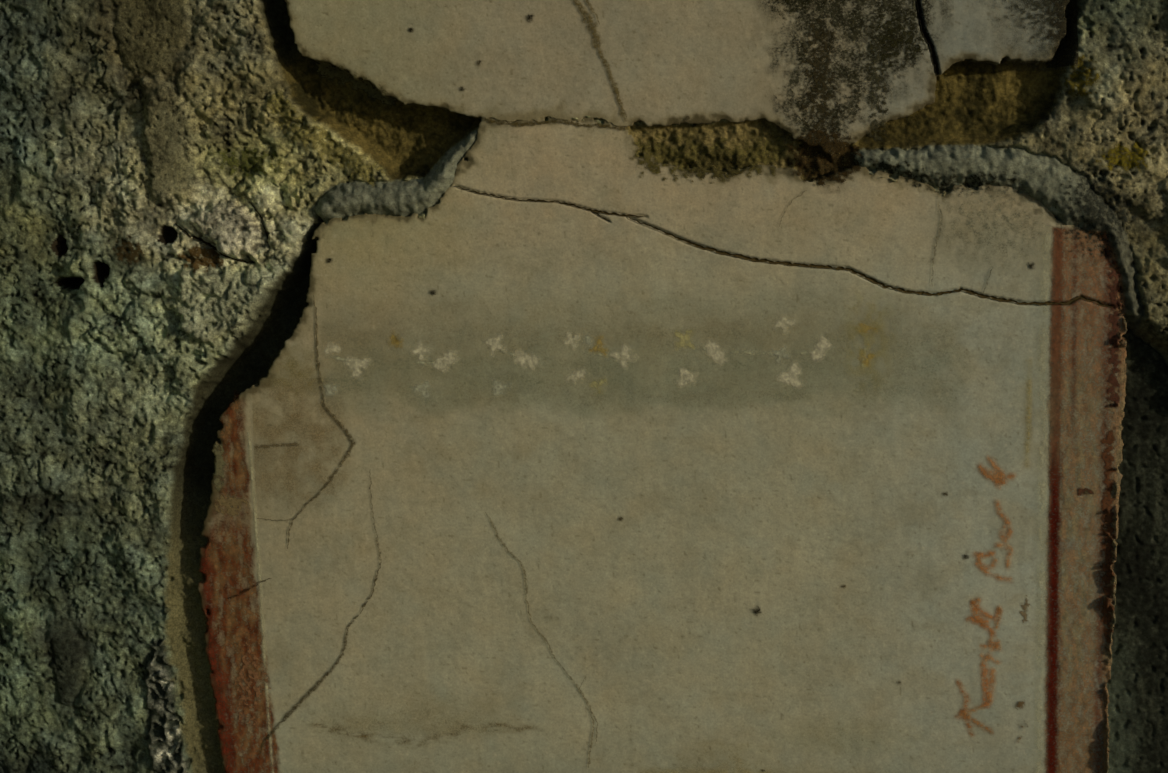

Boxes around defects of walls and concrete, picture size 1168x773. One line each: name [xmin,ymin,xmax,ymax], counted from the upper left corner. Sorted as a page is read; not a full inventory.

spalling [164,214,332,773]
crack [257,295,355,549]
crack [261,484,381,751]
spalling [259,0,481,181]
crack [485,0,629,130]
crack [457,186,1113,307]
spalling [627,0,1082,182]
leakage [760,0,1036,249]
crack [916,0,939,74]
leakage [1055,162,1138,256]
peeling [1078,427,1116,652]
peeling [1107,261,1123,407]